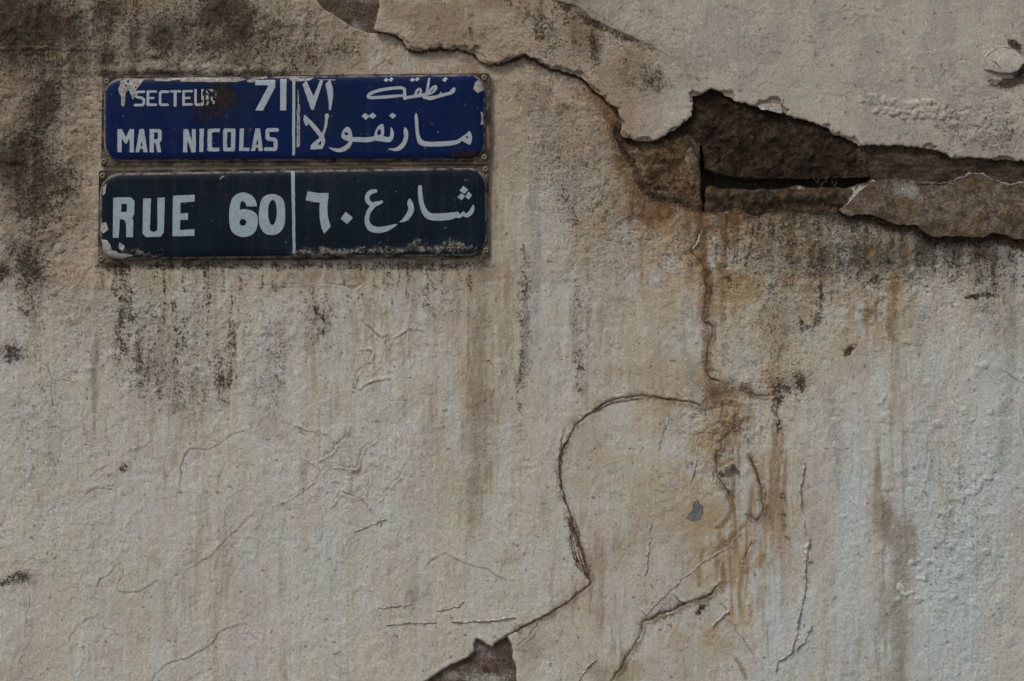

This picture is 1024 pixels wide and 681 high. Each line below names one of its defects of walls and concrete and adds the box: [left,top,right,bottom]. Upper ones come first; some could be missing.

leakage [120,0,317,76]
leakage [0,0,142,319]
spalling [611,89,1024,239]
leakage [108,262,147,392]
leakage [208,319,237,403]
leakage [767,370,807,432]
leakage [799,243,841,332]
leakage [852,215,1024,282]
crack [507,395,703,645]
rust [716,492,745,594]
spalling [428,637,517,681]
crack [612,583,720,681]